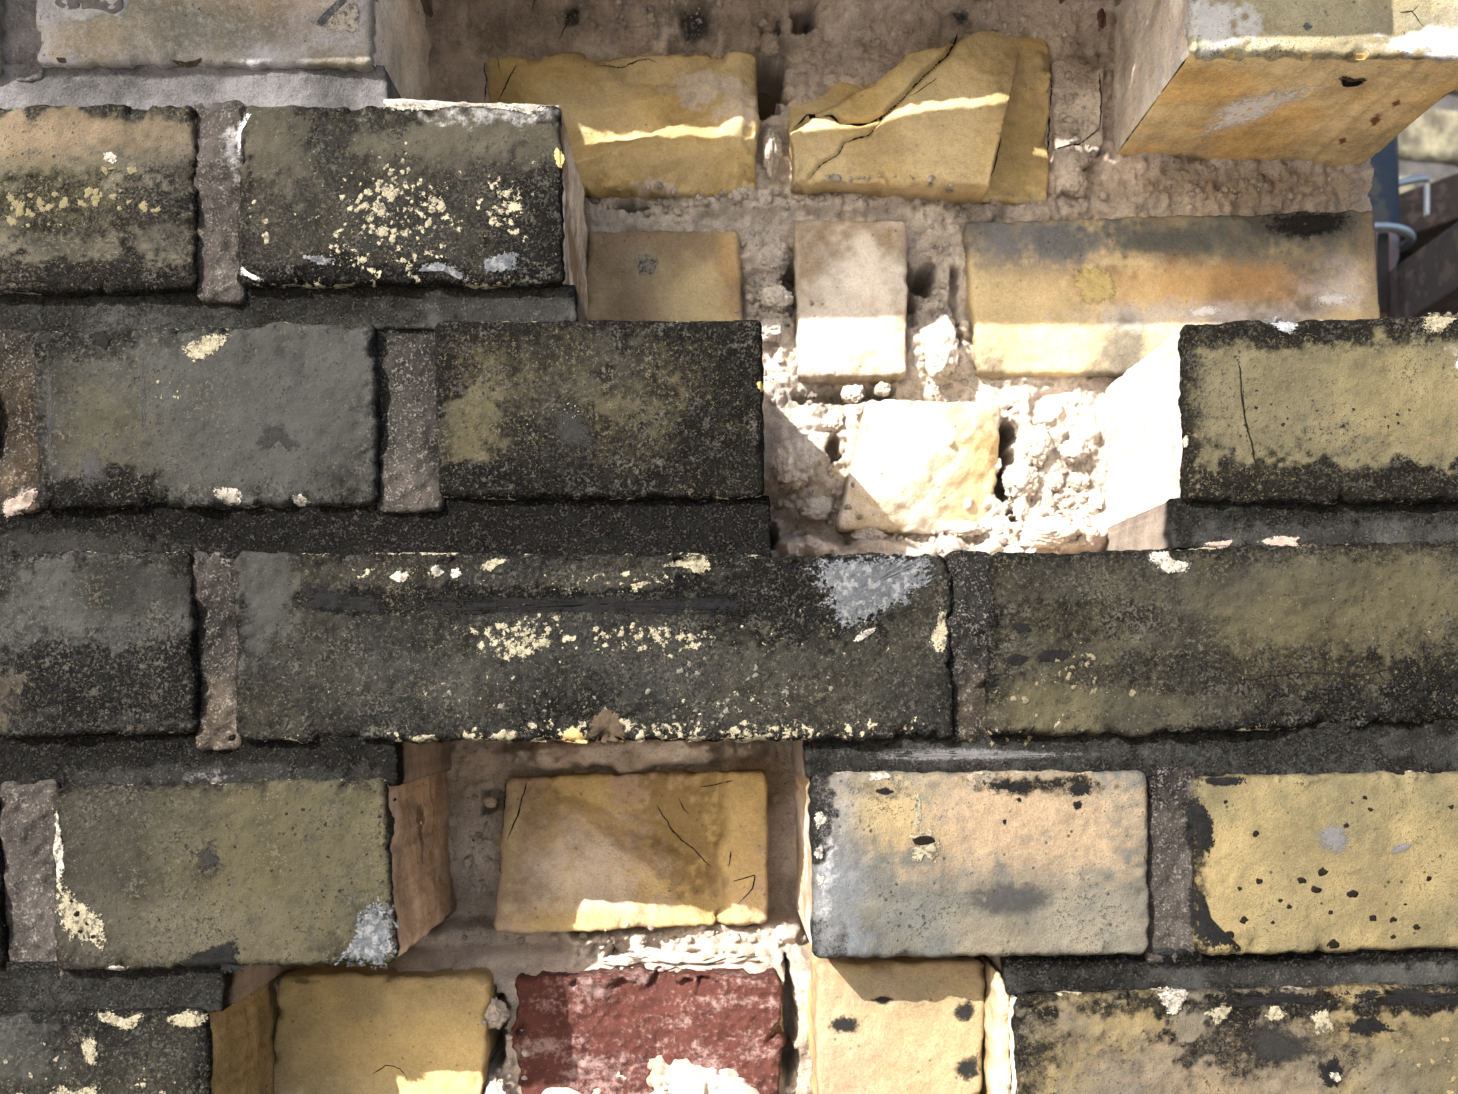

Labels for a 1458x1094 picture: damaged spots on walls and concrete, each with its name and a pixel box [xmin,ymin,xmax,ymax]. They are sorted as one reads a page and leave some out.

crack [795,33,958,176]
spalling [1071,267,1116,305]